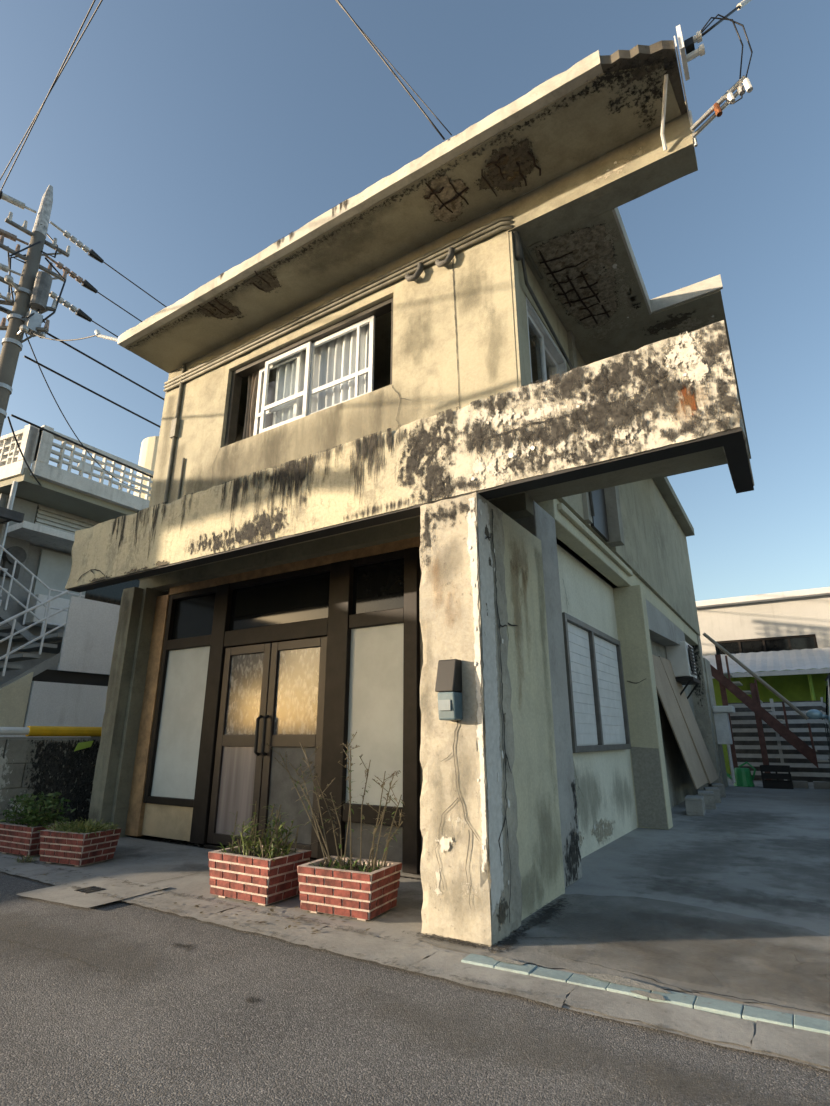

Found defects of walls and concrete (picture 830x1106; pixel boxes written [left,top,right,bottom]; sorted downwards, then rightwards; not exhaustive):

damp [607,67,663,128]
spalling [423,139,541,223]
damp [343,321,742,566]
corrosion [678,384,696,415]
damp [188,445,341,554]
crack [435,509,830,1015]